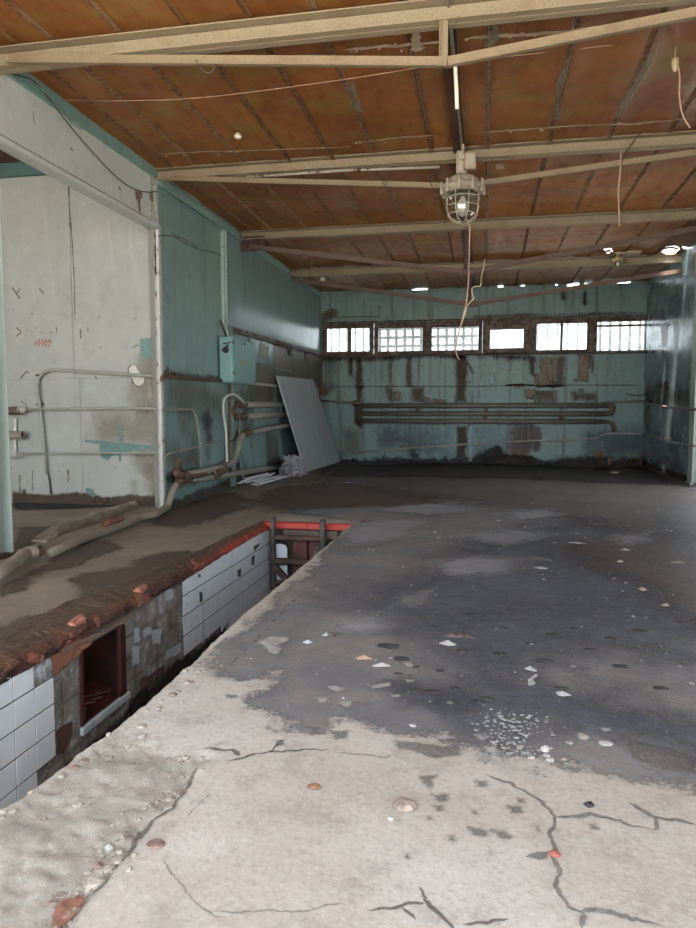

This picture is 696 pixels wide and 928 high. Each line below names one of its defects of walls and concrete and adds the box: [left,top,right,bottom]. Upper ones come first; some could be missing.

water stain [661,321,692,351]
rust [324,356,424,428]
rust [435,356,474,403]
peeling [85,425,154,462]
rust [456,426,467,459]
water stain [434,557,536,575]
spalling [0,529,270,819]
water stain [390,682,696,772]
spalling [48,755,205,928]
crack [61,739,327,928]
crack [487,775,696,928]
crack [370,887,507,928]